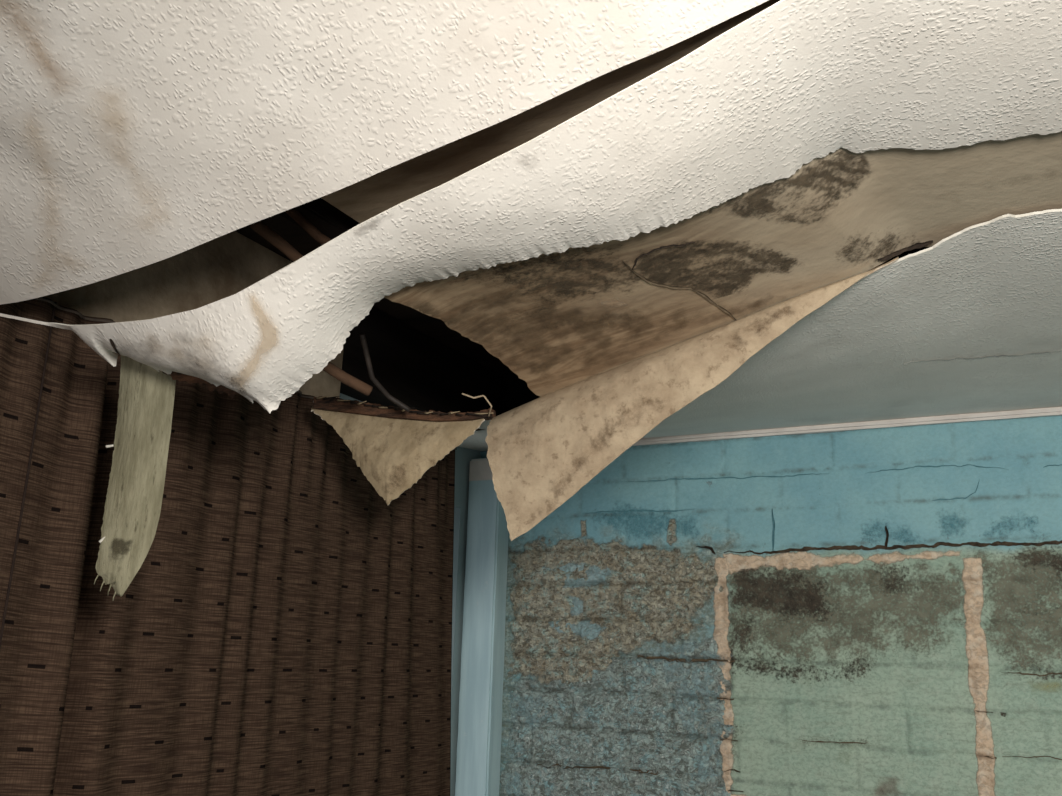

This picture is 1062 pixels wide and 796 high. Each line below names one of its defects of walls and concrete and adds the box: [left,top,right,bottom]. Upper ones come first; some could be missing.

leakage [729,151,869,223]
leakage [842,235,899,262]
peeling [311,256,899,541]
peeling [94,355,176,600]
crack [586,507,692,515]
crack [625,473,829,482]
crack [696,509,1062,555]
leakage [726,563,965,683]
leakage [974,547,1062,687]
peeling [501,637,733,796]